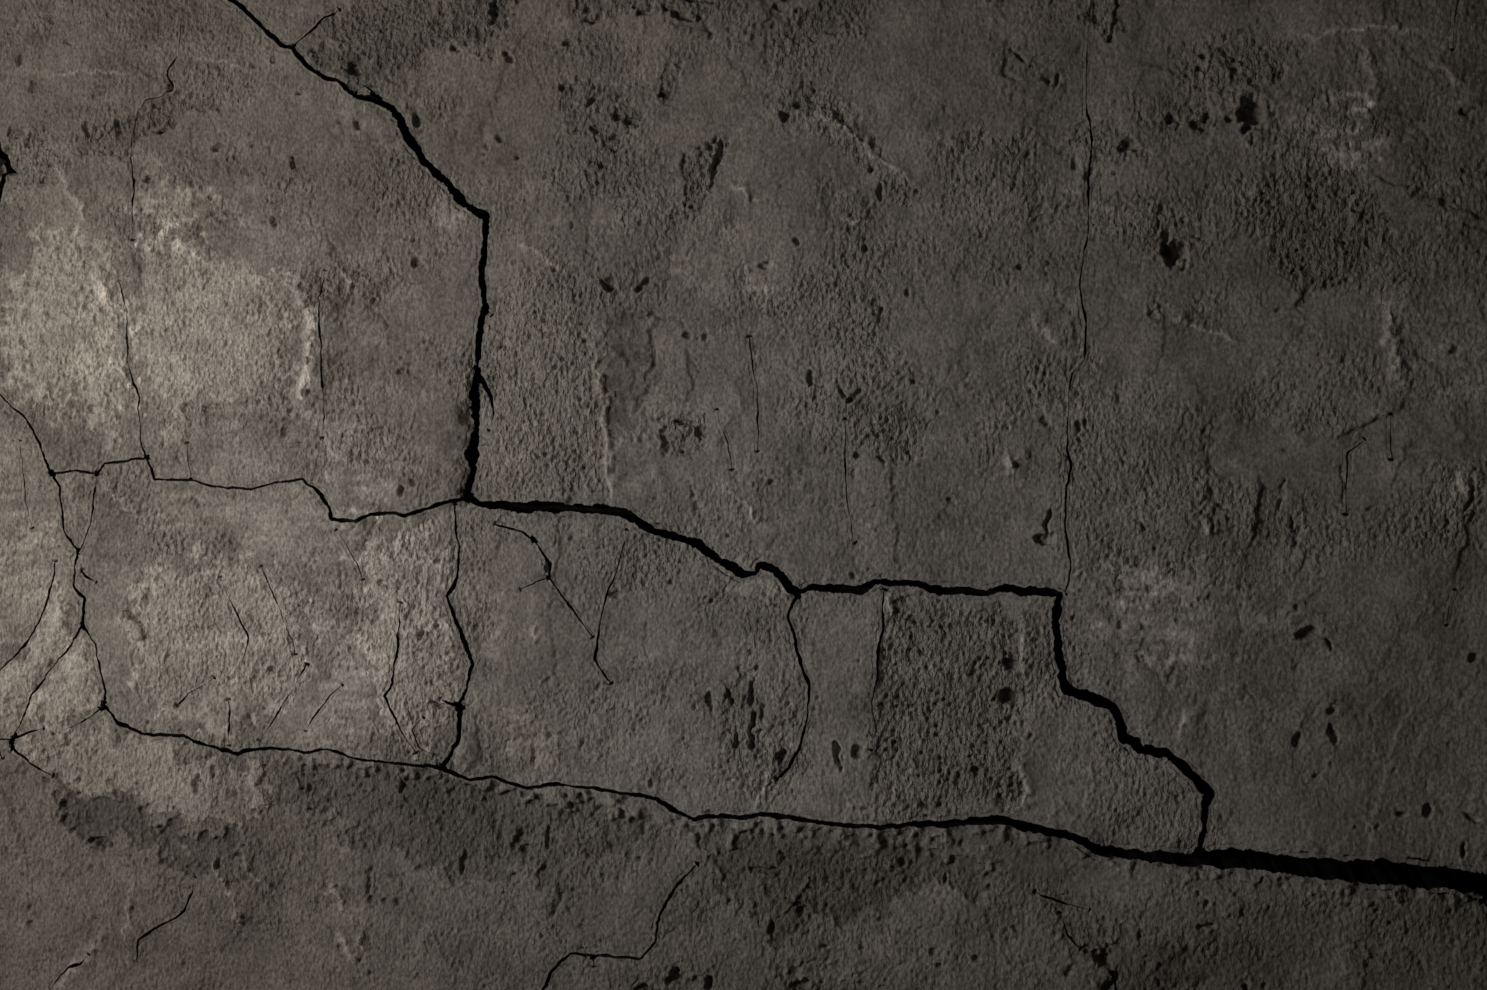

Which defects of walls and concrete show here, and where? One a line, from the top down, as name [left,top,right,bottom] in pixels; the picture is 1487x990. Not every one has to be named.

crack [0,142,16,202]
crack [54,0,495,763]
crack [717,338,759,469]
crack [0,394,1487,897]
crack [1064,45,1093,592]
crack [541,864,697,990]